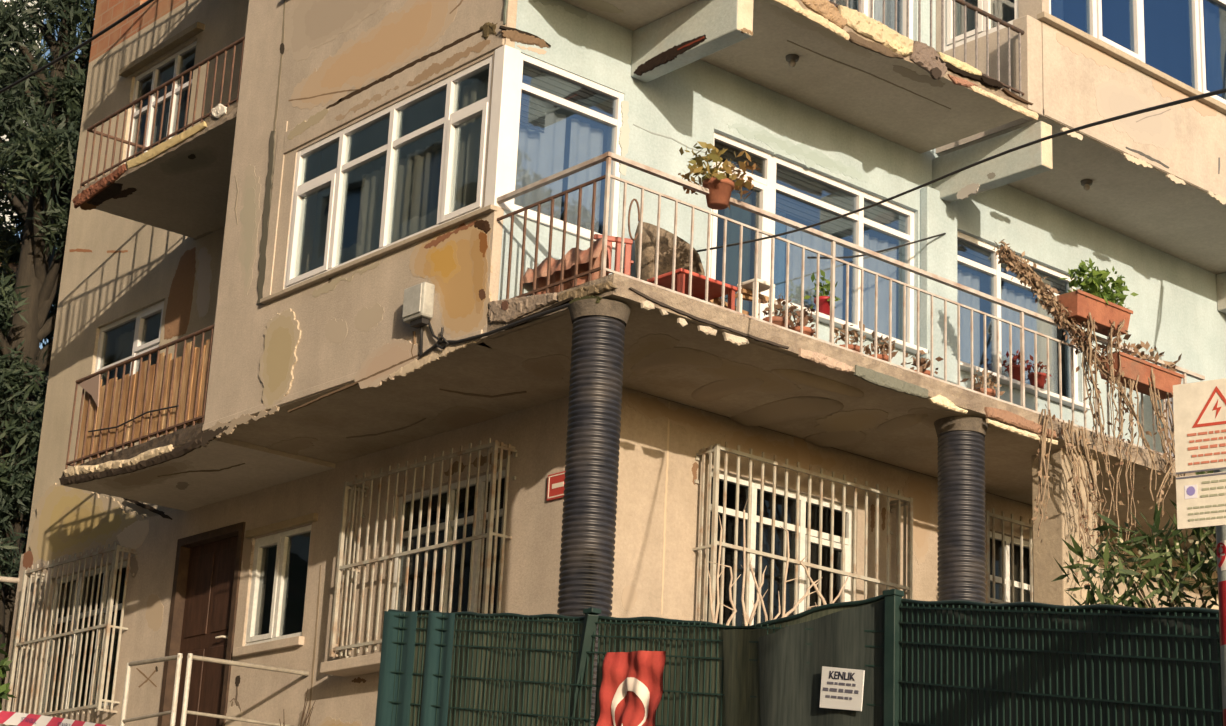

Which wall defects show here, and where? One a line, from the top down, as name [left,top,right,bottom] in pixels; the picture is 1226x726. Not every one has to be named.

spalling [480,22,550,54]
spalling [633,35,707,76]
spalling [772,0,1039,121]
spalling [72,104,227,208]
peeling [1122,153,1153,169]
peeling [1166,174,1186,185]
peeling [1207,191,1226,205]
water stain [409,219,493,339]
spalling [640,300,749,346]
spalling [59,437,202,485]